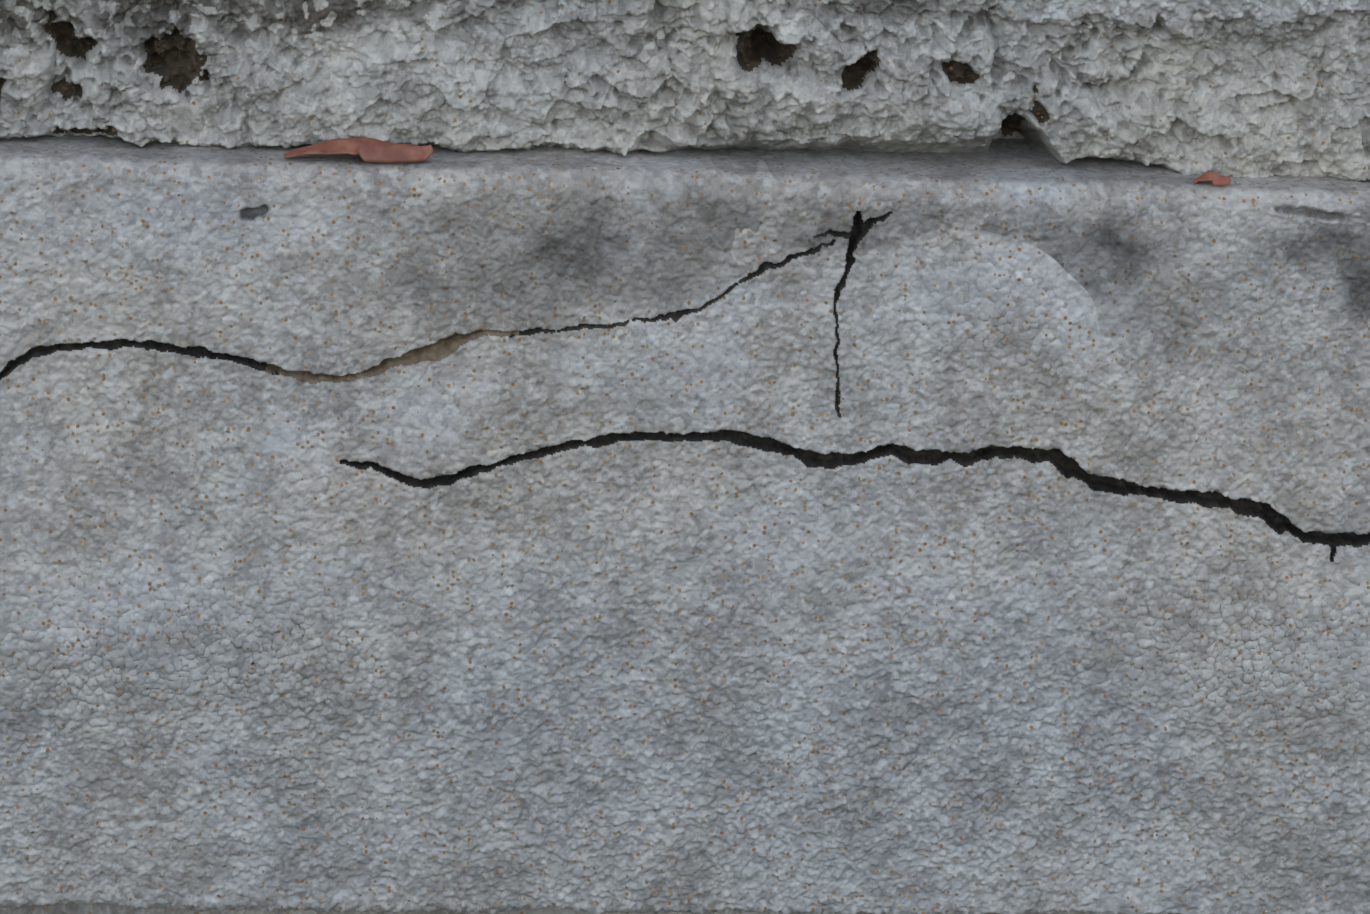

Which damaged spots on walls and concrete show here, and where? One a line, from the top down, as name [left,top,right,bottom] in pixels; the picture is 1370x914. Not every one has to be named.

crack [0,211,893,418]
crack [340,430,1370,562]